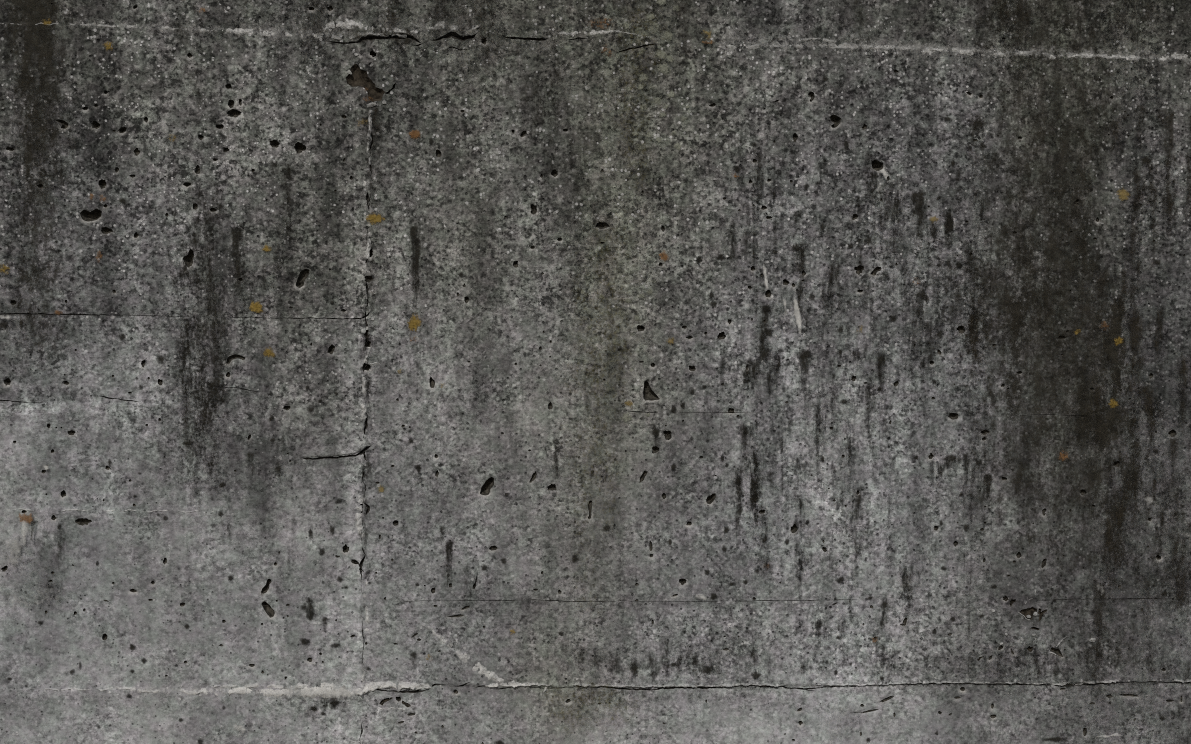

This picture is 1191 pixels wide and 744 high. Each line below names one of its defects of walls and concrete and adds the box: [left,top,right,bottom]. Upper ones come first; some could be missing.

water stain [728,153,782,264]
water stain [170,186,243,453]
water stain [231,225,279,299]
water stain [760,305,769,343]
water stain [796,244,807,323]
water stain [852,0,1191,570]
water stain [721,351,781,394]
water stain [799,349,838,432]
water stain [735,423,805,586]
water stain [902,568,912,617]